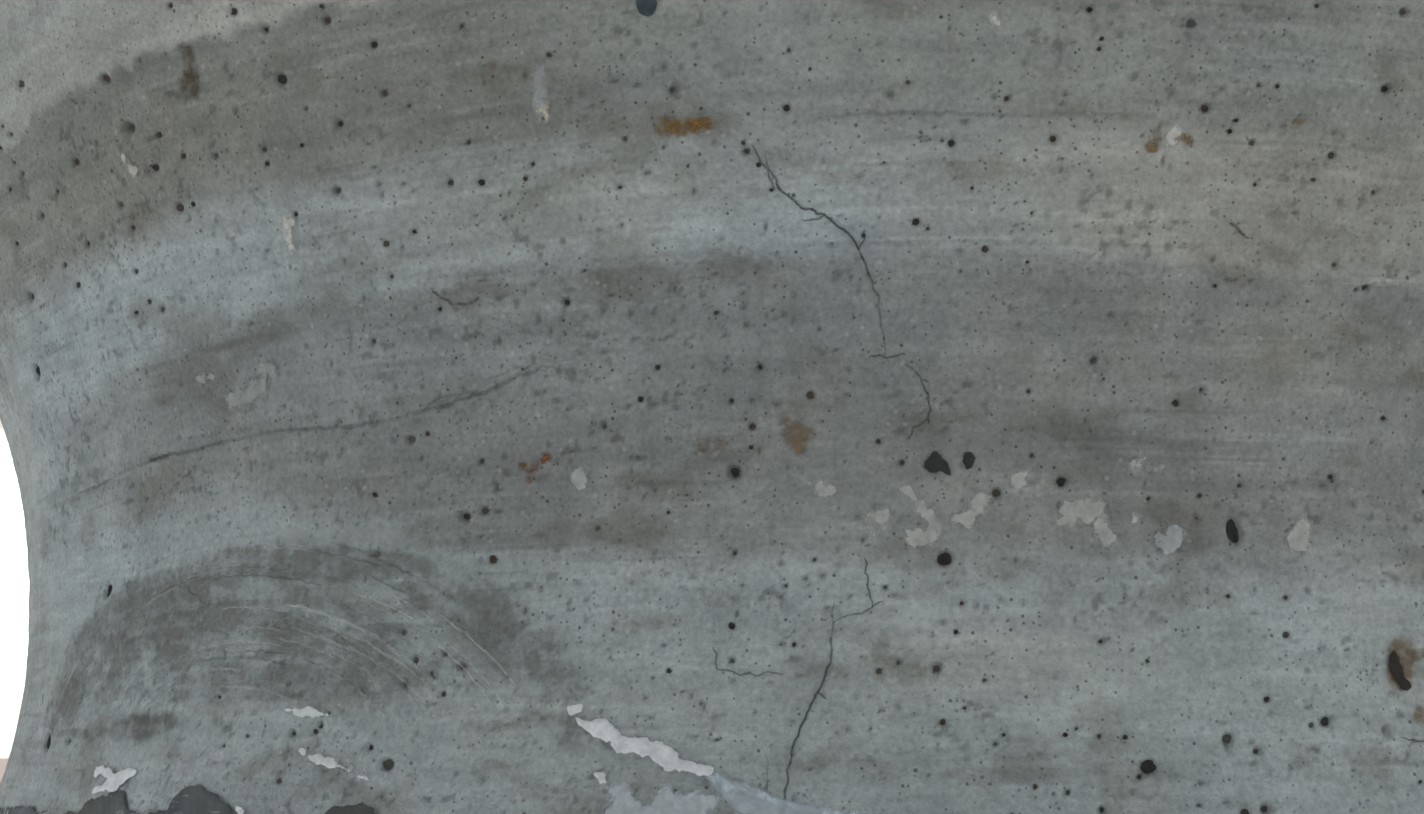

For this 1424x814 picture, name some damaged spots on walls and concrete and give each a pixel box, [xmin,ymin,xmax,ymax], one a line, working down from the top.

corrosion [657,118,712,135]
crack [752,145,879,296]
crack [869,353,931,439]
spalling [924,451,975,475]
spalling [899,485,991,547]
spalling [1056,498,1116,548]
crack [784,557,883,800]
peeling [284,706,329,718]
peeling [0,765,245,814]
peeling [298,748,369,781]
peeling [325,803,375,814]
peeling [566,703,843,814]